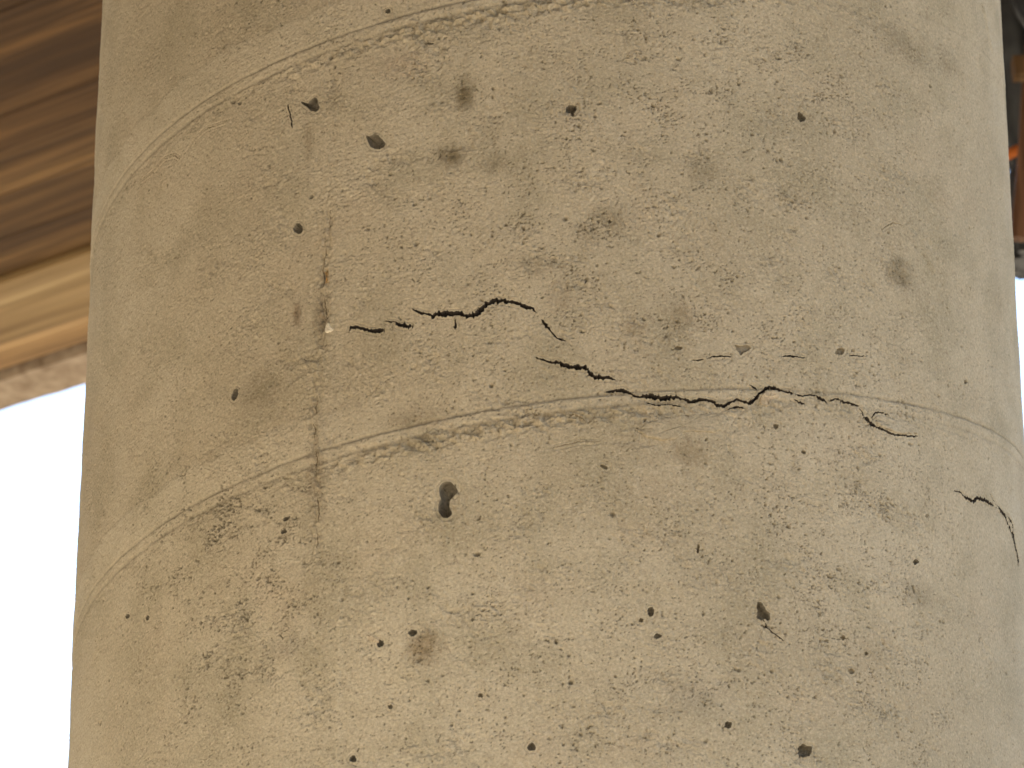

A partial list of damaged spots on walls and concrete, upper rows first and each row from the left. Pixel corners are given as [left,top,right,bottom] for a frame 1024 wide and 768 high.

crack [321,210,918,439]
crack [311,400,323,549]
crack [552,411,600,450]
crack [954,488,1019,564]